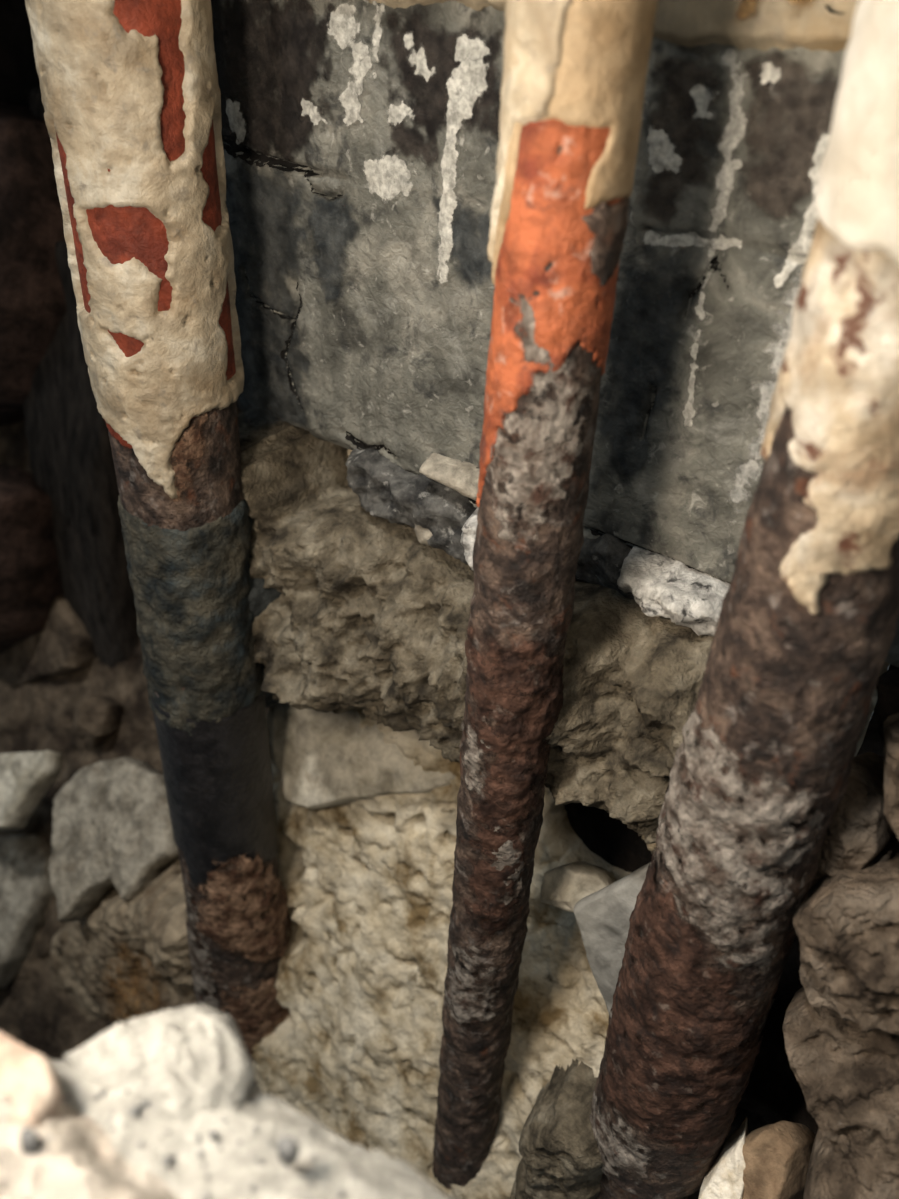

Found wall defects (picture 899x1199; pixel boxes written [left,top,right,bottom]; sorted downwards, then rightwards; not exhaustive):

damp [379,8,501,166]
damp [646,47,723,223]
damp [740,52,840,219]
damp [434,198,493,284]
rust [168,412,208,502]
damp [600,244,716,482]
damp [730,263,806,511]